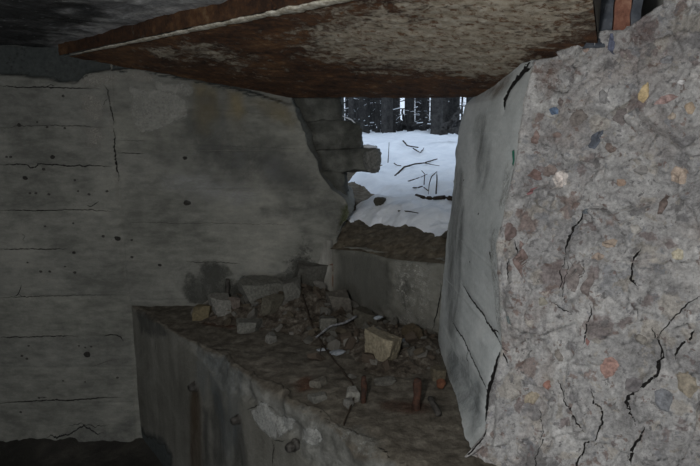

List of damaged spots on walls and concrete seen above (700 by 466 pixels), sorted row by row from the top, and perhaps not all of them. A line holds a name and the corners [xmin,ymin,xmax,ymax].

crack [503,62,532,110]
crack [1,84,143,182]
crack [555,210,584,312]
crack [629,249,641,286]
spalling [251,402,296,439]
spalling [302,428,323,445]
crack [432,283,508,456]
crack [558,382,604,466]
crack [624,296,699,462]